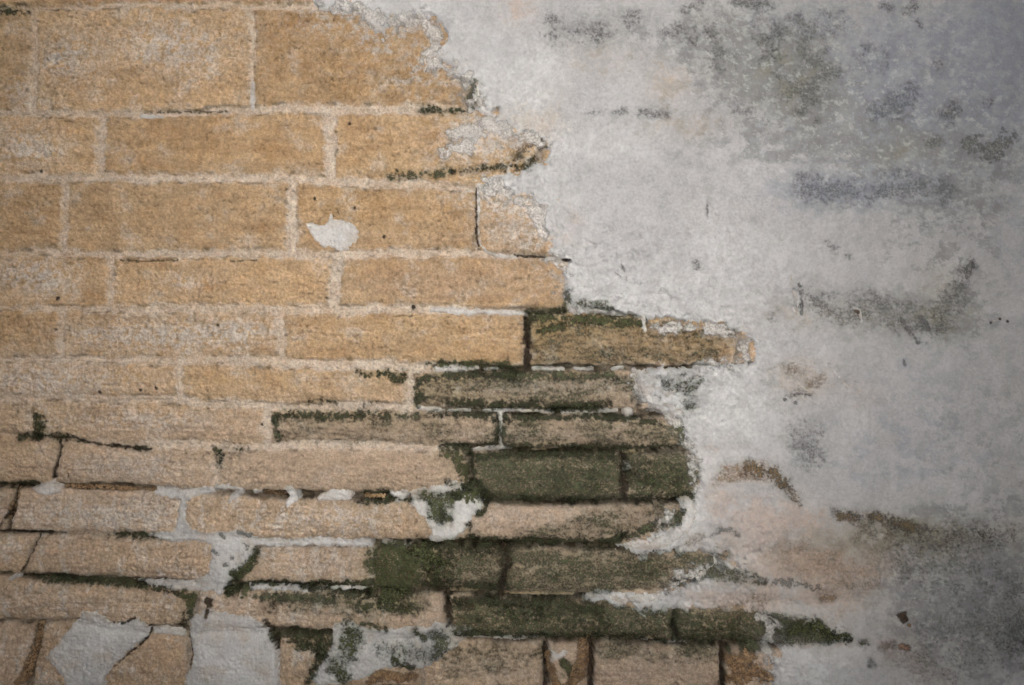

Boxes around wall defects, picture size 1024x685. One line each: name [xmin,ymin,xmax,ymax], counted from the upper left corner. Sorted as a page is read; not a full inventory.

peeling [424,53,496,159]
leakage [961,127,1017,163]
peeling [566,301,647,333]
leakage [810,260,975,344]
peeling [447,407,634,422]
peeling [636,369,684,417]
peeling [622,437,702,550]
leakage [724,460,802,507]
leakage [835,511,996,586]
peeling [587,556,718,618]
peeling [153,624,187,636]
leakage [767,616,852,643]